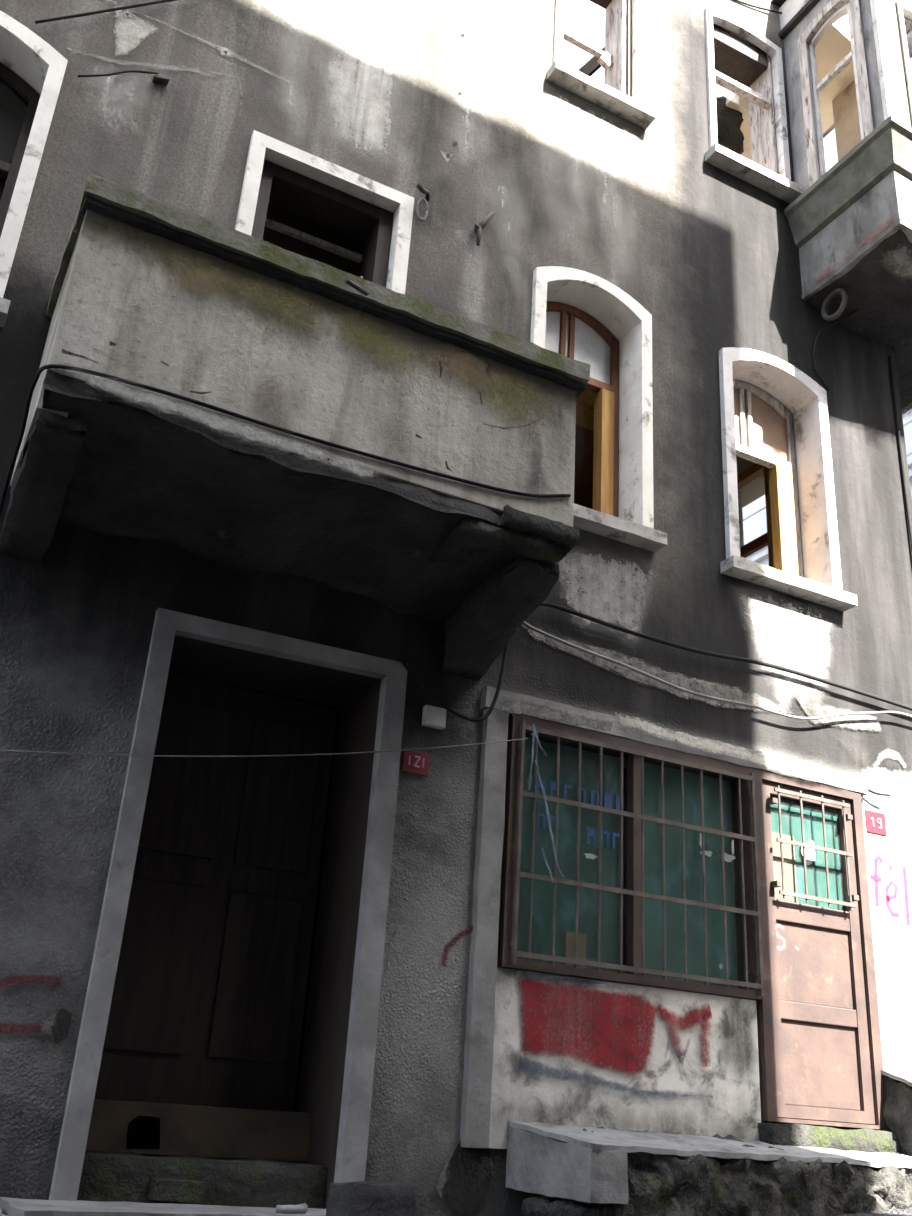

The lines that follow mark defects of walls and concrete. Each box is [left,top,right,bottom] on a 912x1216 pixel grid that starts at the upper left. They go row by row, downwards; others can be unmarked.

damp [329,0,392,148]
damp [414,0,447,154]
spalling [521,624,881,731]